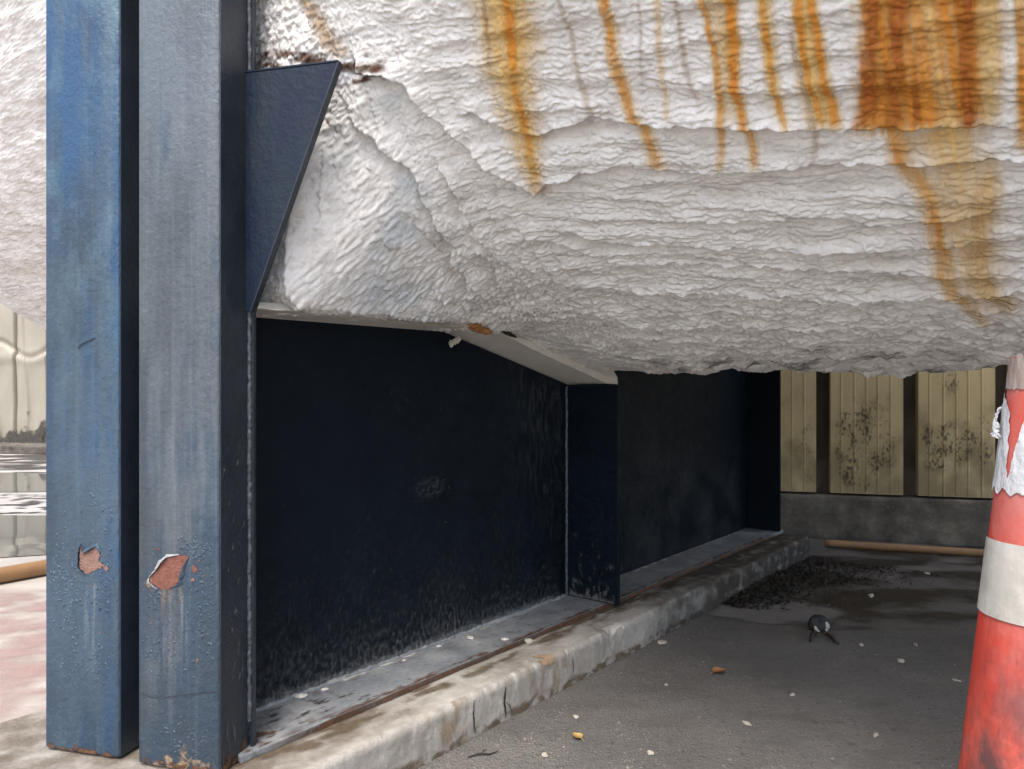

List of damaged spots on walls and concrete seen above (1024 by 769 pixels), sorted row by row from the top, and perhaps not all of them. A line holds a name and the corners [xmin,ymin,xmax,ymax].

rust [481,0,539,178]
rust [598,0,659,168]
rust [698,0,757,165]
rust [759,0,786,129]
rust [793,0,840,127]
rust [855,0,1000,305]
rust [1015,0,1024,147]
mould [835,407,894,485]
mould [923,423,990,469]
peeling [73,543,108,586]
peeling [146,549,205,590]
crack [503,687,511,717]